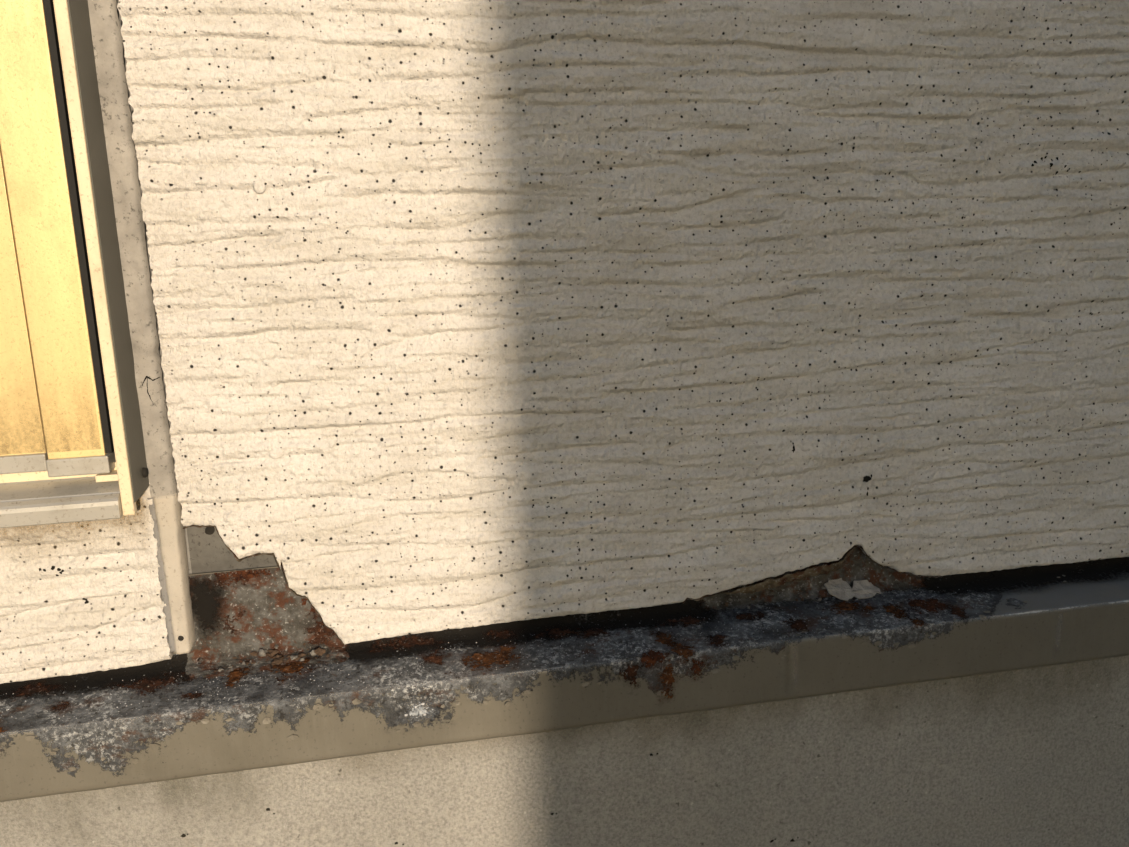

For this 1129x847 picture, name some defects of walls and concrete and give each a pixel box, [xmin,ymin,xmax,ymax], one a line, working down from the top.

corrosion [209,569,276,587]
corrosion [821,597,968,628]
corrosion [223,598,335,687]
corrosion [370,635,521,678]
peeling [0,525,1027,777]
corrosion [619,614,729,701]
corrosion [111,672,204,699]
corrosion [389,686,449,731]